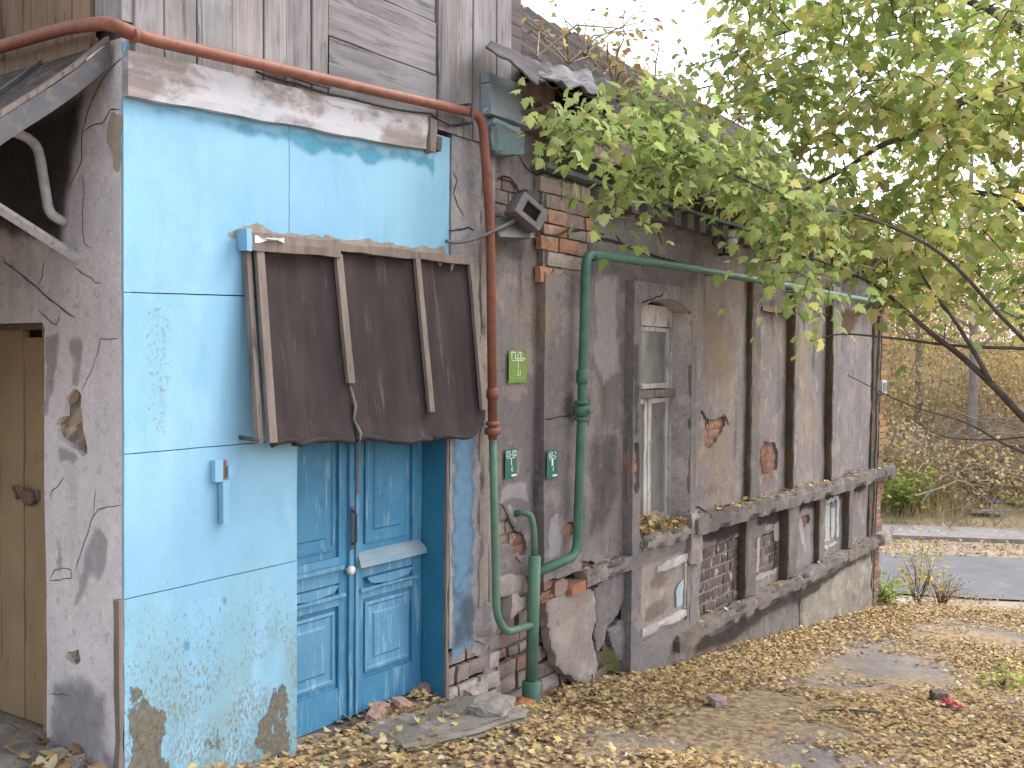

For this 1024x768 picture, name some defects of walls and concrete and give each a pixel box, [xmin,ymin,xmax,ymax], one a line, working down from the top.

crack [68,58,122,283]
peeling [107,112,123,172]
spalling [61,389,87,454]
spalling [704,417,723,448]
spalling [759,442,776,477]
crack [49,489,120,581]
spalling [499,518,525,555]
spalling [448,561,593,705]
spalling [594,641,618,678]
peeling [124,687,170,768]
peeling [254,684,290,760]